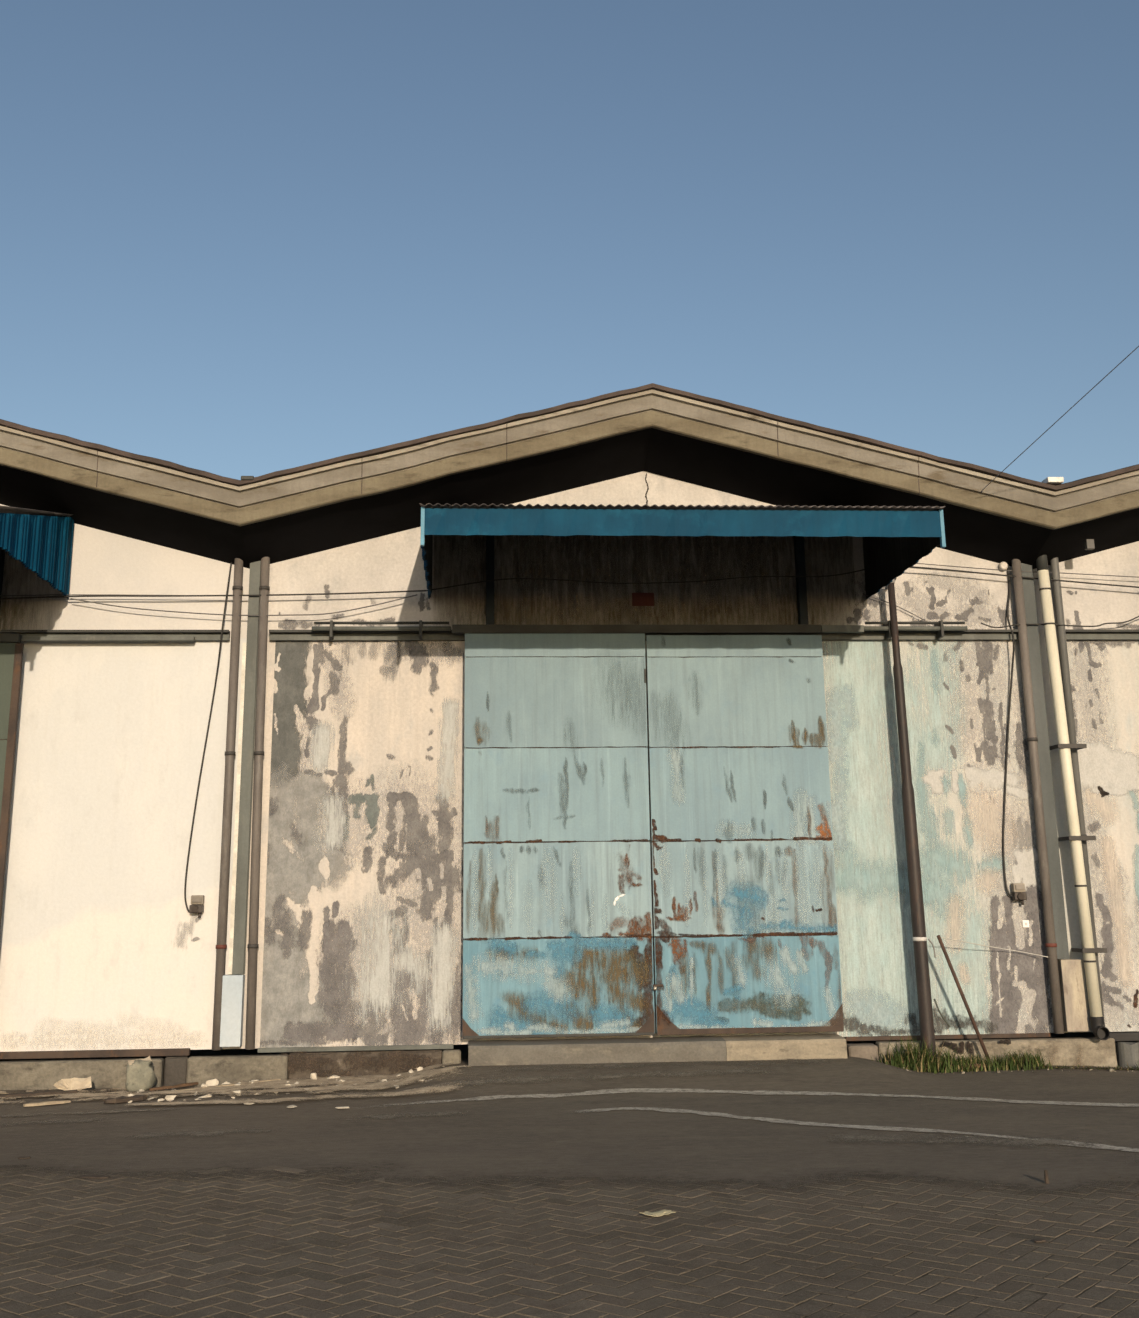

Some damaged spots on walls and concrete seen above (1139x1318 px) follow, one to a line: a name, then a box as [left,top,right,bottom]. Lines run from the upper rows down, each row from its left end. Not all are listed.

peeling [847,581,1007,626]
peeling [945,641,1028,774]
peeling [1067,611,1105,733]
peeling [270,598,463,1077]
corrosion [468,811,838,1034]
peeling [989,885,1052,1044]
peeling [1096,893,1131,1009]
spalling [936,1041,974,1061]